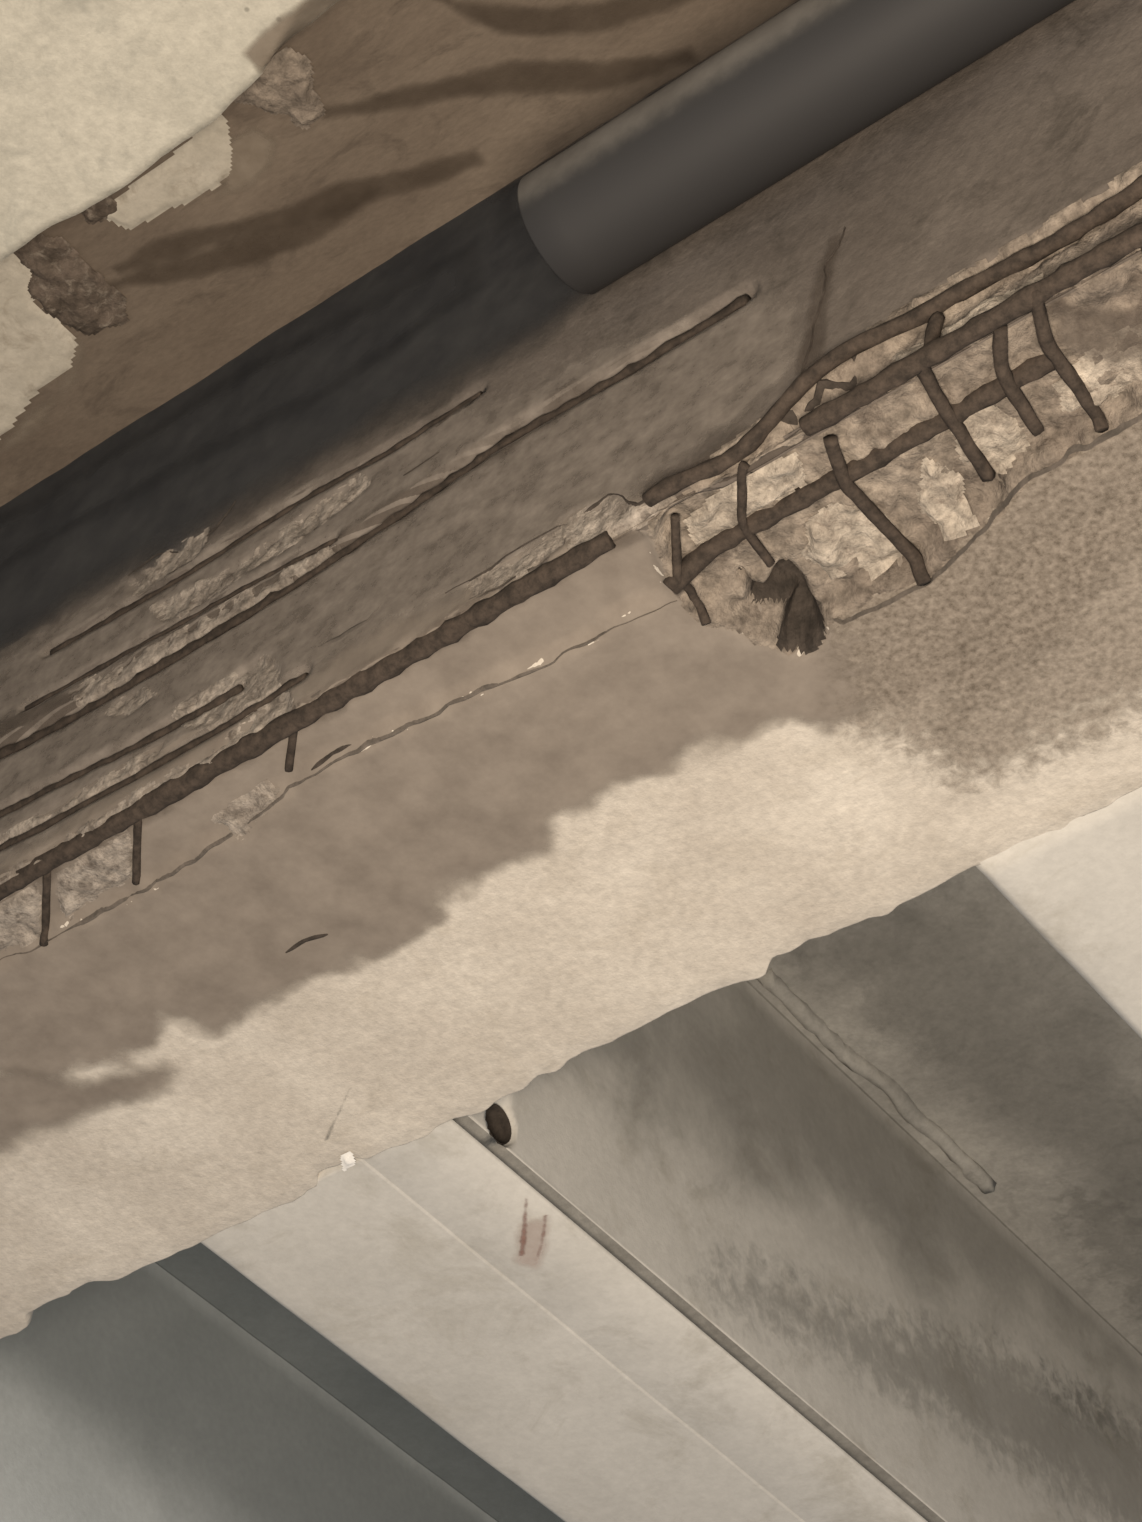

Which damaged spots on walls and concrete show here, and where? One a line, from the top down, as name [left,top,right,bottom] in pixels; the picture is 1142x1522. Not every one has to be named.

peeling [81,47,326,230]
water stain [247,0,338,71]
water stain [128,155,477,282]
water stain [331,53,689,114]
water stain [462,0,680,32]
water stain [0,181,585,650]
spalling [0,161,1142,960]
water stain [0,494,883,1148]